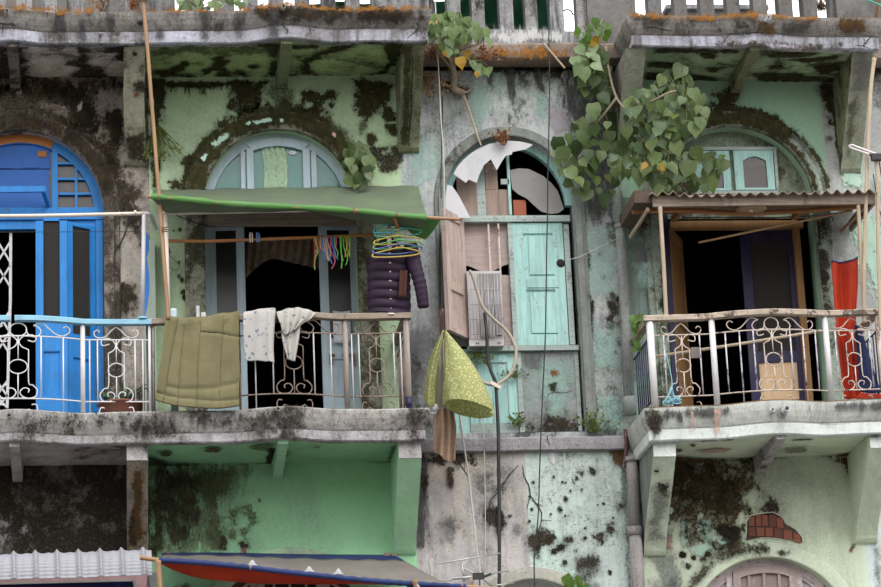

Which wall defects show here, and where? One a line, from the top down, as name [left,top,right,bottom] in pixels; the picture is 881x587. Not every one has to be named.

leakage [644,48,739,81]
leakage [752,52,840,83]
leakage [0,0,427,230]
leakage [13,408,177,445]
leakage [187,405,306,464]
leakage [834,401,881,410]
leakage [148,448,261,557]
leakage [416,453,624,587]
leakage [644,406,789,587]
flaking render [745,512,803,543]